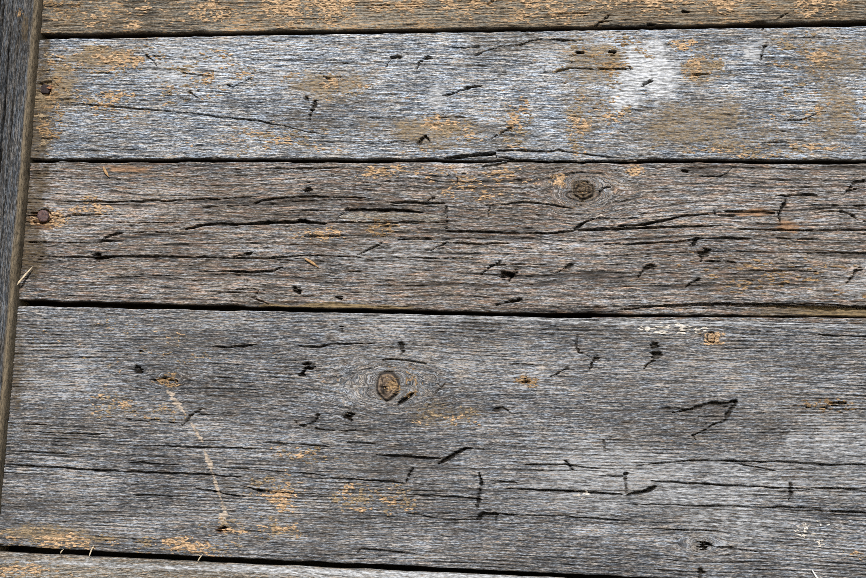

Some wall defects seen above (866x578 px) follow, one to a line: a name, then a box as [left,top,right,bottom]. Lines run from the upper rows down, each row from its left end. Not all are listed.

crack [186,196,327,230]
crack [345,197,461,246]
crack [484,194,811,246]